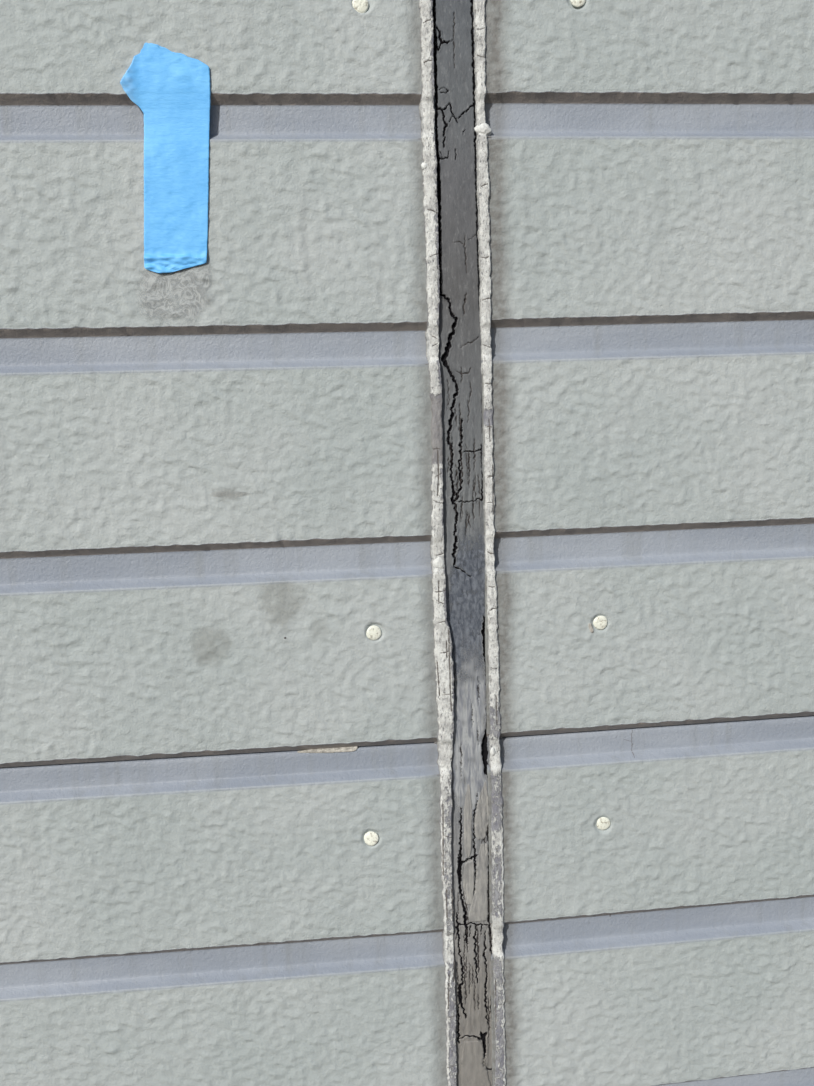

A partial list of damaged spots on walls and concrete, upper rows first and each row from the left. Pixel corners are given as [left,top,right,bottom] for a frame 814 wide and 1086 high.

crack [423,0,497,1070]